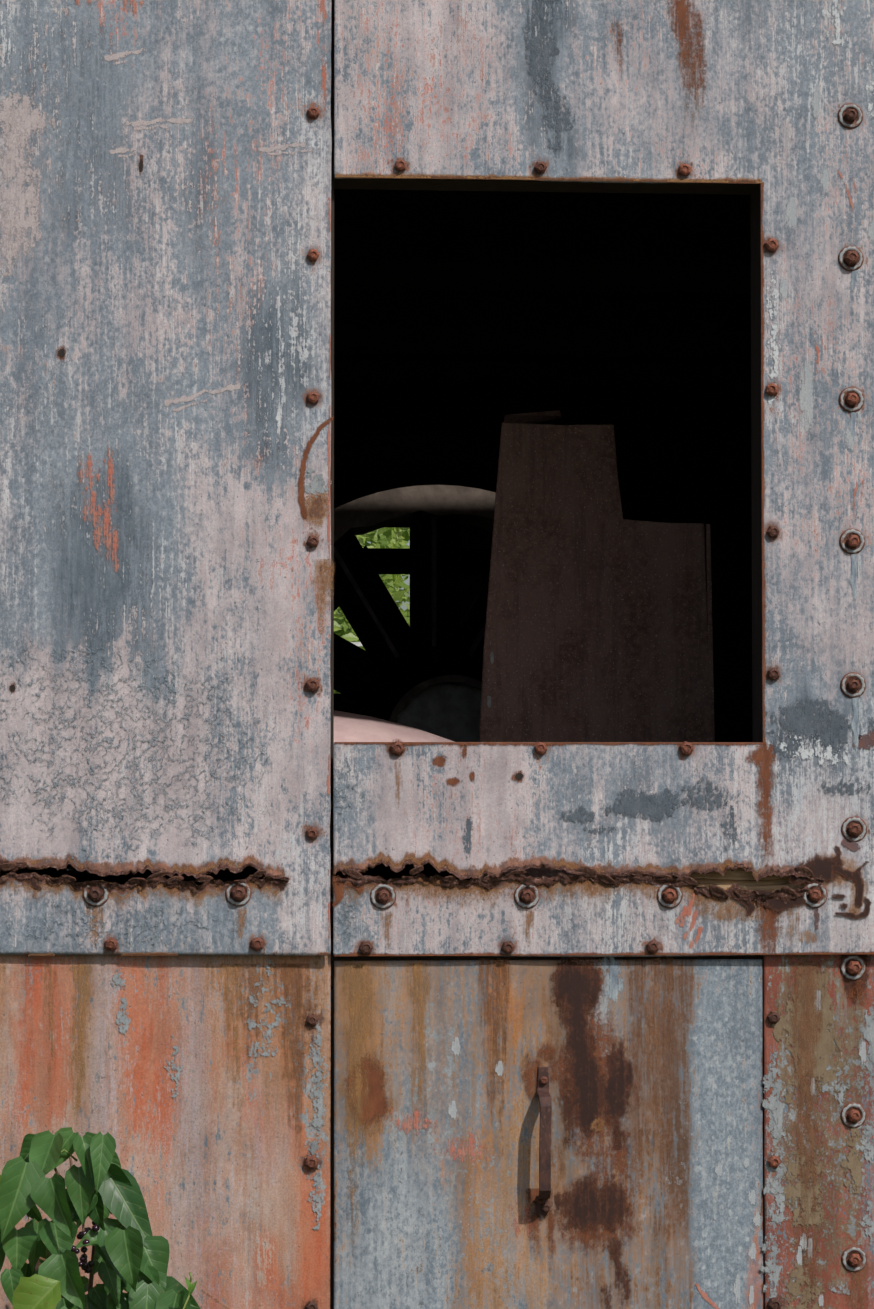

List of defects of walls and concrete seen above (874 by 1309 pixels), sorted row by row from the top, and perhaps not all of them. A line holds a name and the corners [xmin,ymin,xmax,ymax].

corrosion [671,0,706,102]
peeling [0,76,61,278]
peeling [77,447,119,572]
peeling [300,468,332,525]
corrosion [313,406,333,632]
corrosion [327,173,776,866]
crack [0,858,290,905]
crack [332,845,872,920]
corrosion [320,902,874,1309]